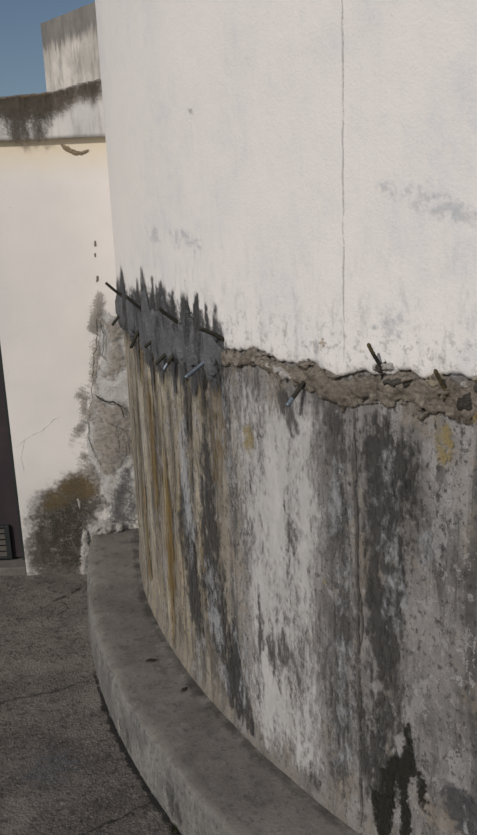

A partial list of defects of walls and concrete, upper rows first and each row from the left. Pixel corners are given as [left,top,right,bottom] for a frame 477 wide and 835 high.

leakage [3,94,45,143]
leakage [182,382,191,447]
leakage [24,467,139,575]
leakage [169,414,204,648]
leakage [228,632,254,737]
leakage [360,719,429,835]
leakage [441,788,477,835]